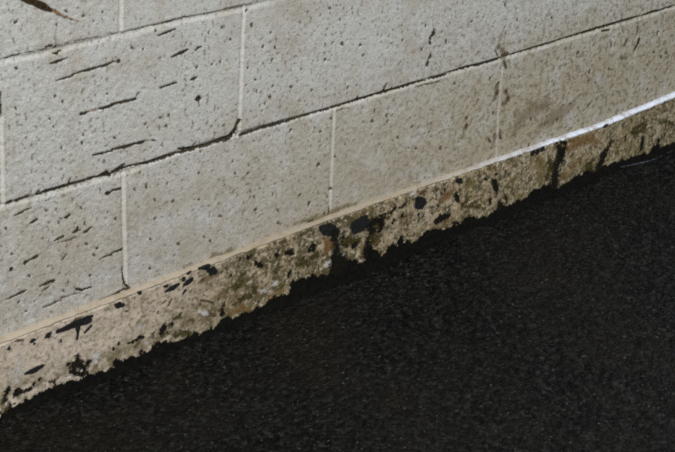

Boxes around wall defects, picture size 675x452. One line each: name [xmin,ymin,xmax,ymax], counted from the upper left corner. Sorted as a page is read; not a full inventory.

crack [110,1,258,34]
crack [5,6,672,204]
spalling [92,139,156,156]
peeling [409,189,427,210]
peeling [350,215,387,235]
peeling [319,223,350,276]
peeling [163,264,218,294]
leakage [0,119,675,421]
peeling [5,315,93,350]
peeling [12,355,45,384]